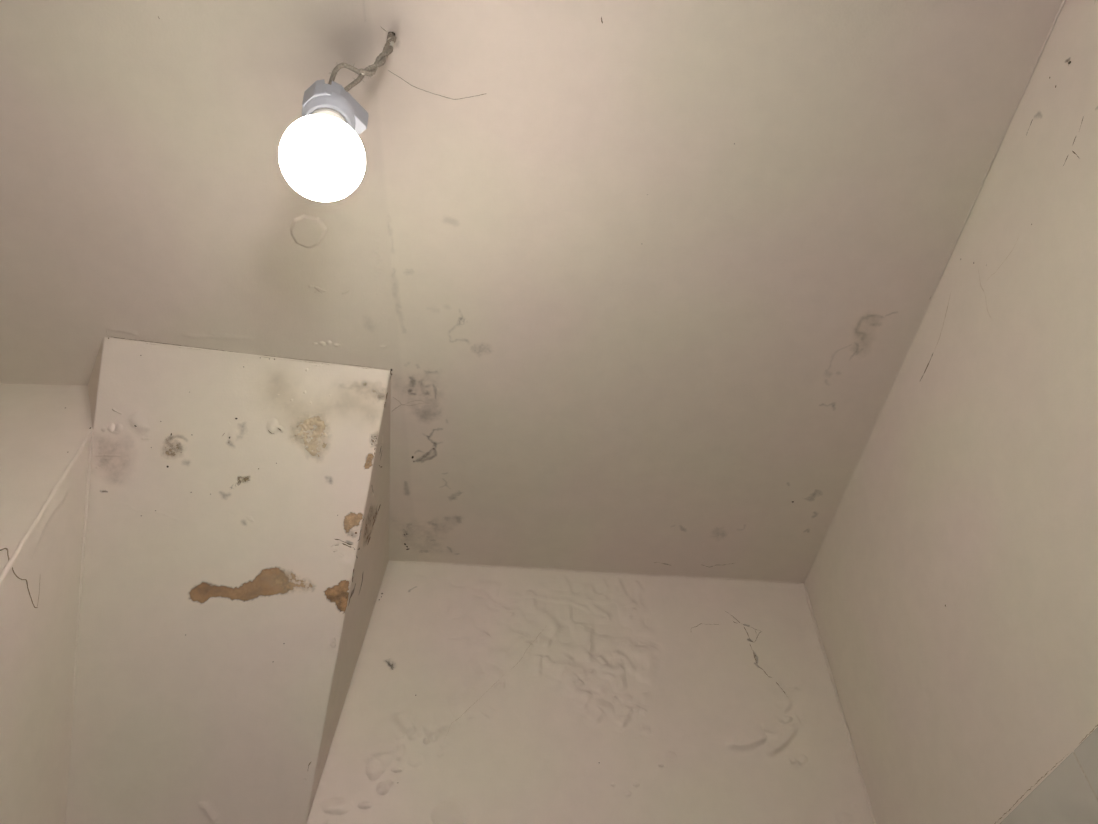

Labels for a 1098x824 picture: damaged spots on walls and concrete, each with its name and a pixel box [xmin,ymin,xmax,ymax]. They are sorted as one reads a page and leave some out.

peeling [330,539,360,571]
crack [691,610,788,697]